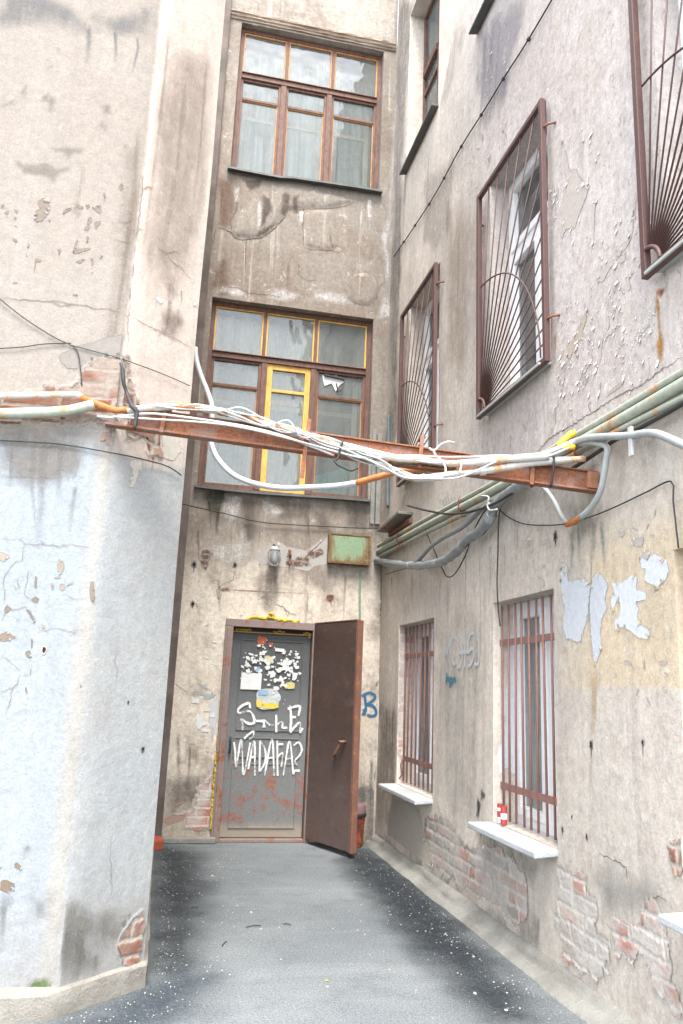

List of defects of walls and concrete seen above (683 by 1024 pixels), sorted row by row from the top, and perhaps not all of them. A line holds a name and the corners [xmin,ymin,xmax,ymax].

peeling [34,198,50,222]
peeling [57,193,106,273]
damp [220,180,305,236]
peeling [548,129,659,431]
flaking render [0,352,164,462]
spalling [257,537,328,571]
peeling [559,509,669,666]
flaking render [163,751,213,835]
flaking render [387,799,528,927]
flaking render [667,831,683,882]
flaking render [114,907,147,968]
flaking render [554,864,683,1020]